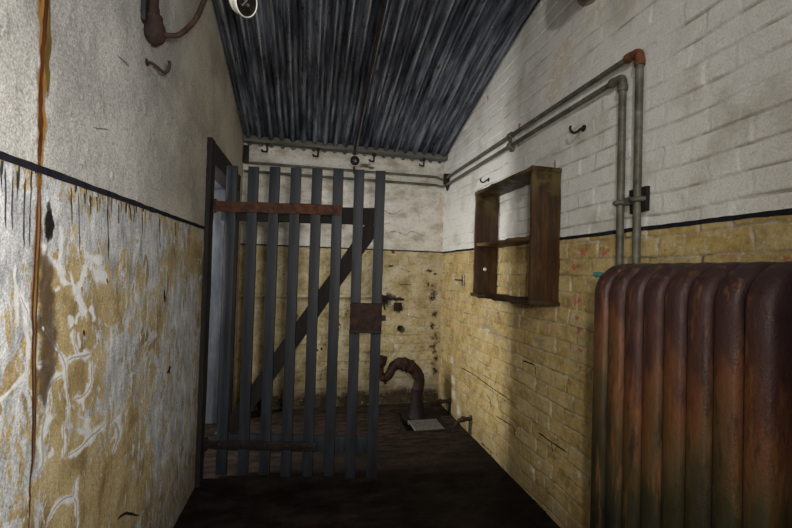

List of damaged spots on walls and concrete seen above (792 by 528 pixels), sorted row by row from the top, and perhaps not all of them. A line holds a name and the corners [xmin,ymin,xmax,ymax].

corrosion [28,0,51,528]